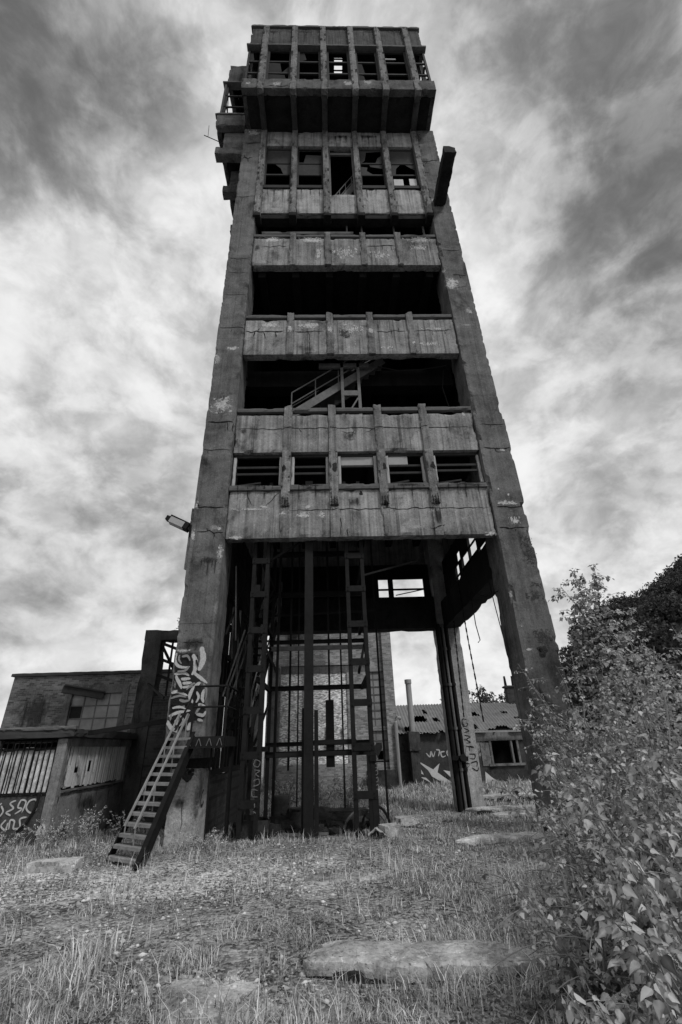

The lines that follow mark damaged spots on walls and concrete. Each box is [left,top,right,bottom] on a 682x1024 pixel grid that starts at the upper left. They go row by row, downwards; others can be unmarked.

spalling [211,396,233,414]
crack [196,500,224,536]